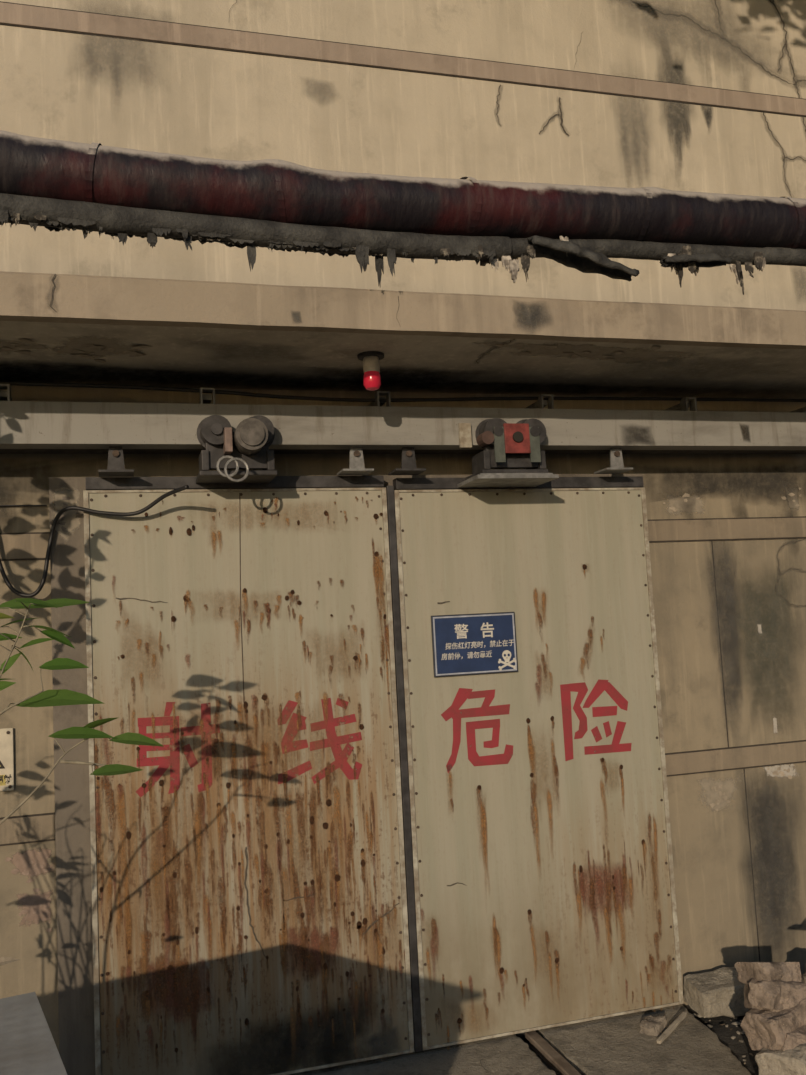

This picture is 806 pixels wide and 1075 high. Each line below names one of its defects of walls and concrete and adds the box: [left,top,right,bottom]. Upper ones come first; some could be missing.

crack [539,97,569,136]
leakage [666,58,685,84]
crack [631,0,806,131]
crack [763,112,806,198]
corrosion [131,501,195,536]
corrosion [234,588,303,638]
corrosion [344,541,390,692]
corrosion [476,785,487,858]
corrosion [526,718,559,863]
corrosion [94,694,405,1062]
corrosion [573,815,674,1010]
corrosion [460,917,529,1016]